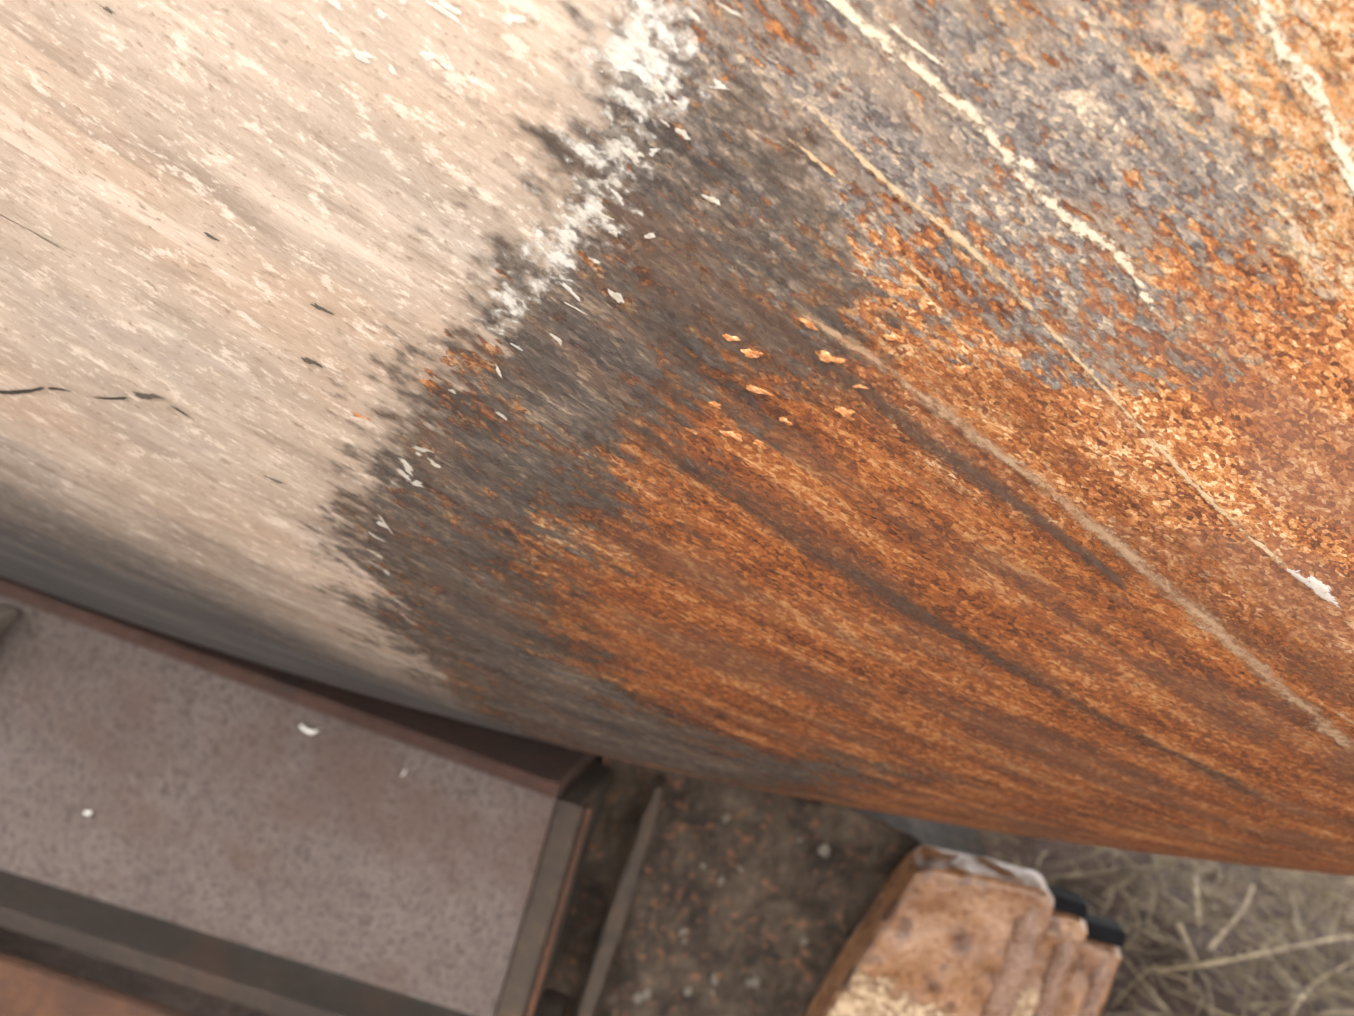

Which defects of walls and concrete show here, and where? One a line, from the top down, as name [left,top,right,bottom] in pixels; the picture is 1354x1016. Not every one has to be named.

peeling [319,0,374,63]
peeling [425,0,467,29]
water stain [564,5,587,30]
crack [0,387,127,400]
water stain [306,63,1262,802]
rust [342,0,1354,876]